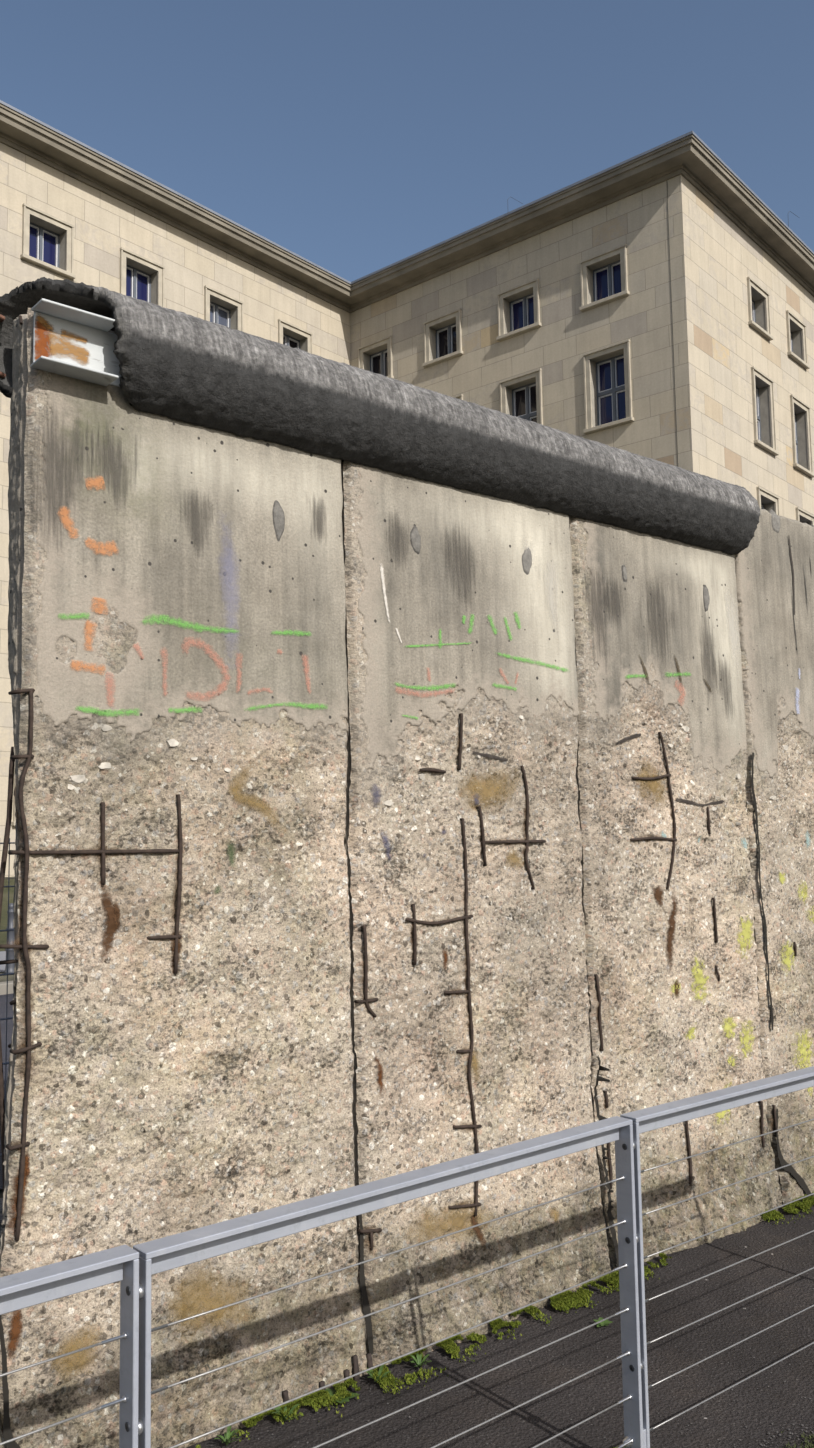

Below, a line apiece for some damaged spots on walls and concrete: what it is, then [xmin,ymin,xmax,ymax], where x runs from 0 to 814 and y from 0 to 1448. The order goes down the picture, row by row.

rust [34,316,89,364]
spalling [0,308,814,1277]
rust [102,893,120,957]
rust [172,932,182,972]
rust [376,1058,384,1091]
spalling [151,1141,619,1448]
rust [8,1310,22,1355]
spalling [0,1281,120,1448]